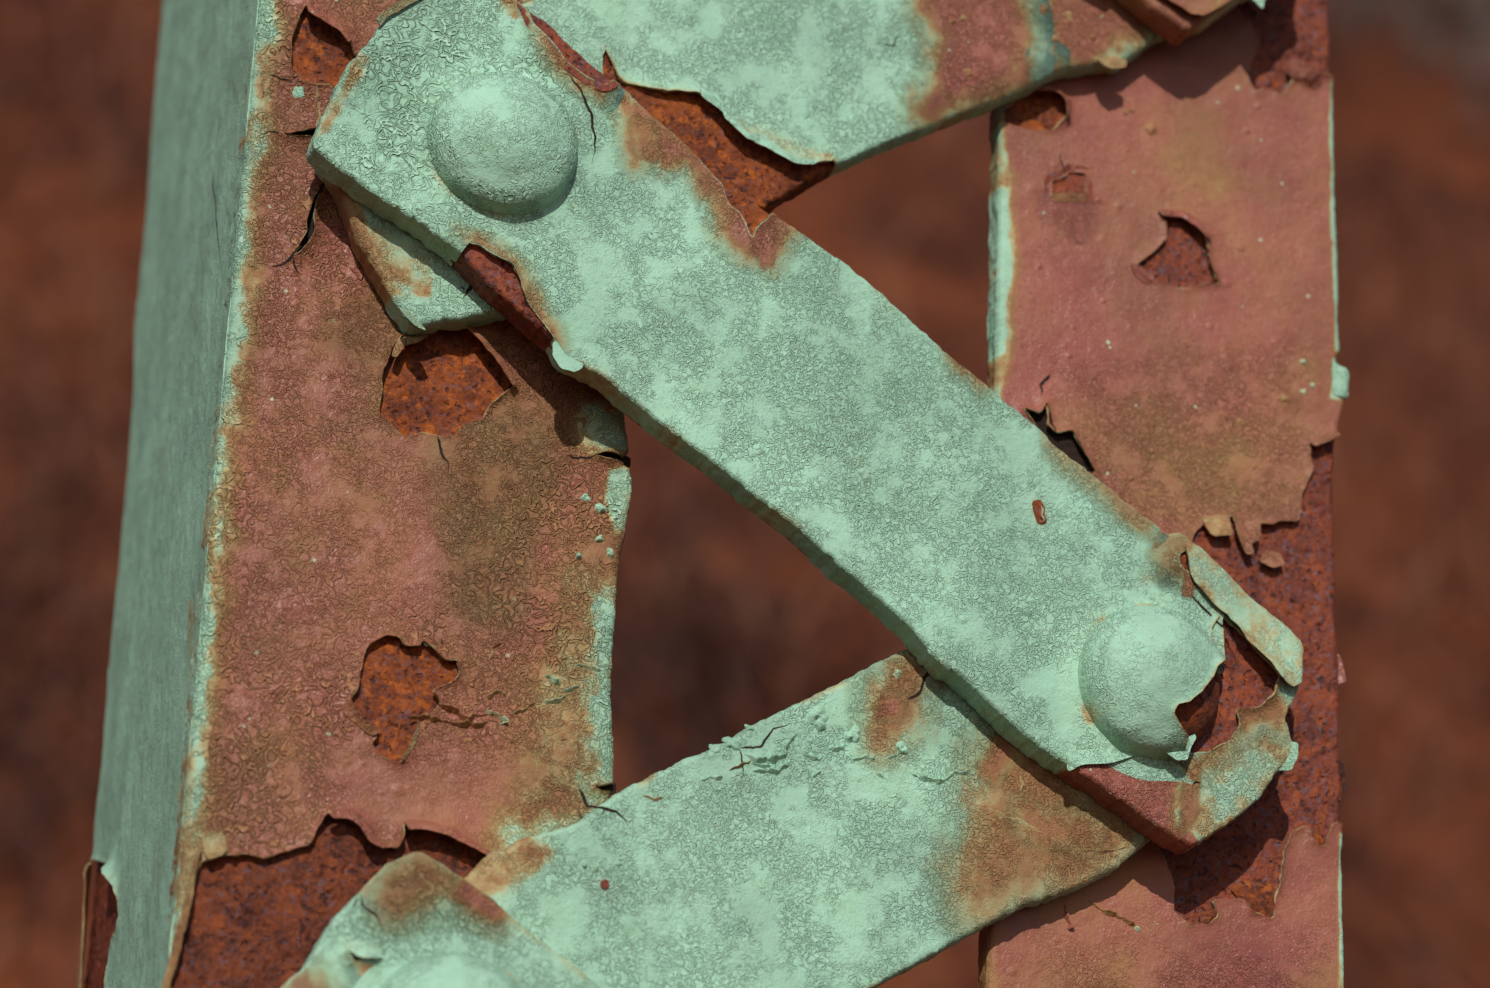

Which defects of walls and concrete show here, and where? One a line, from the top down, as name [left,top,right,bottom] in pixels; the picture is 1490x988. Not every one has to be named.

crack [567,73,596,163]
corrosion [905,0,1154,141]
corrosion [1169,0,1329,94]
corrosion [1131,210,1217,288]
corrosion [333,293,518,437]
corrosion [342,636,458,762]
peeling [701,734,902,782]
peeling [1066,747,1136,771]
corrosion [932,431,1349,936]
peeling [1166,541,1303,761]
peeling [161,844,201,988]
peeling [346,939,382,961]